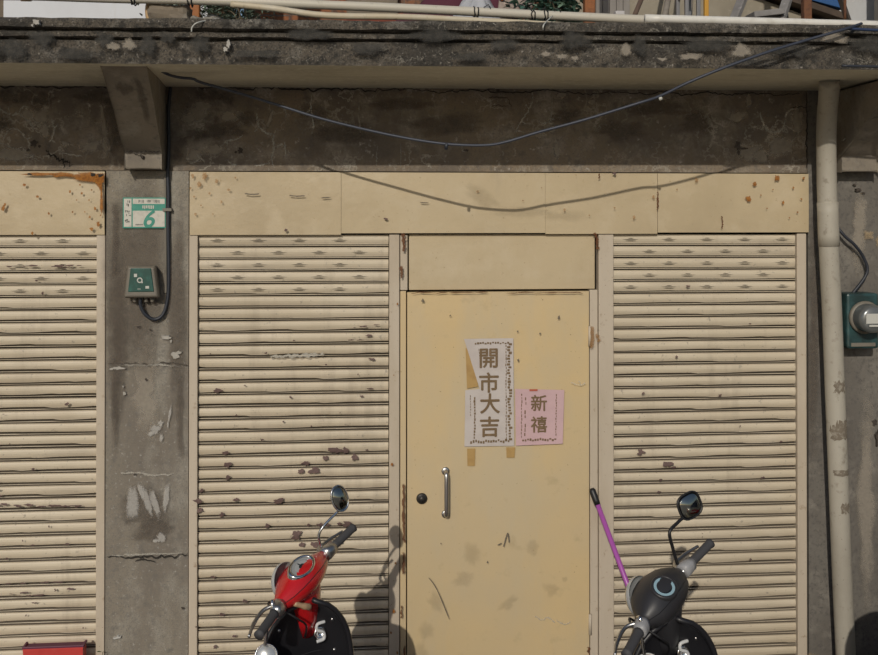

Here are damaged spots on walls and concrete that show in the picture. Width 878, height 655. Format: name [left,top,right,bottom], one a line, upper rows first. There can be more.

crack [198,87,808,167]
crack [46,150,73,168]
rust [22,172,104,231]
crack [109,361,188,369]
peeling [149,407,171,441]
peeling [127,473,169,516]
crack [107,553,187,562]